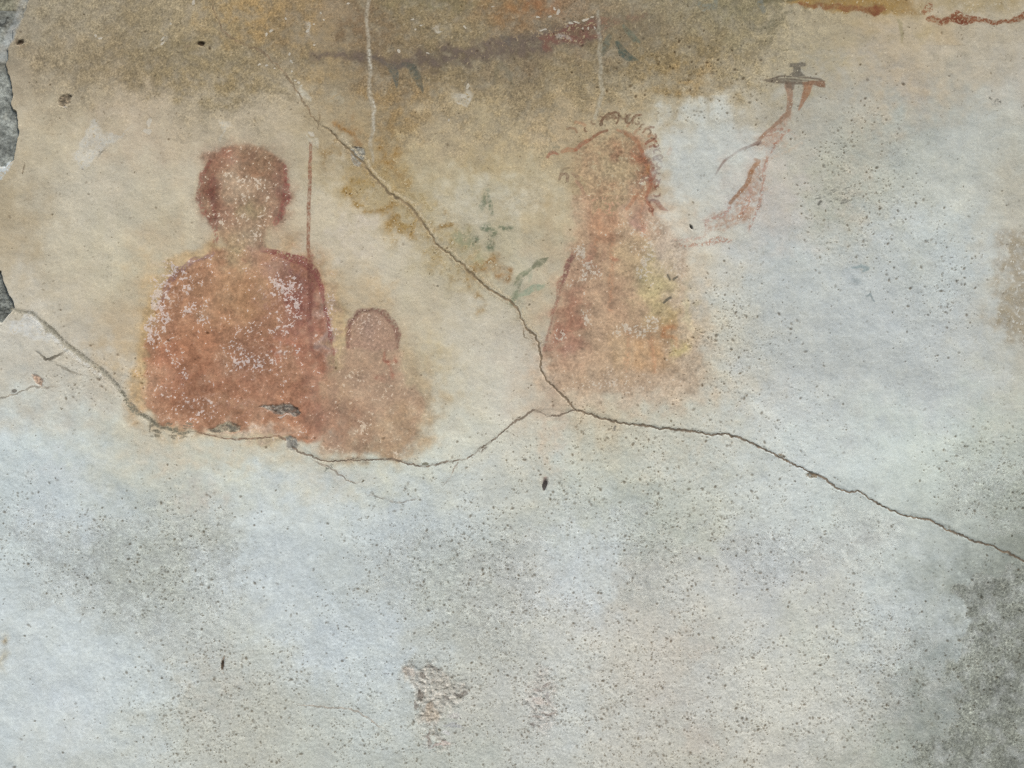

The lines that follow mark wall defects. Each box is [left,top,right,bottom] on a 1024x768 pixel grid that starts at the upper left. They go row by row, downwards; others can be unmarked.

flaking render [0,71,19,180]
flaking render [0,271,14,323]
crack [0,0,1024,563]